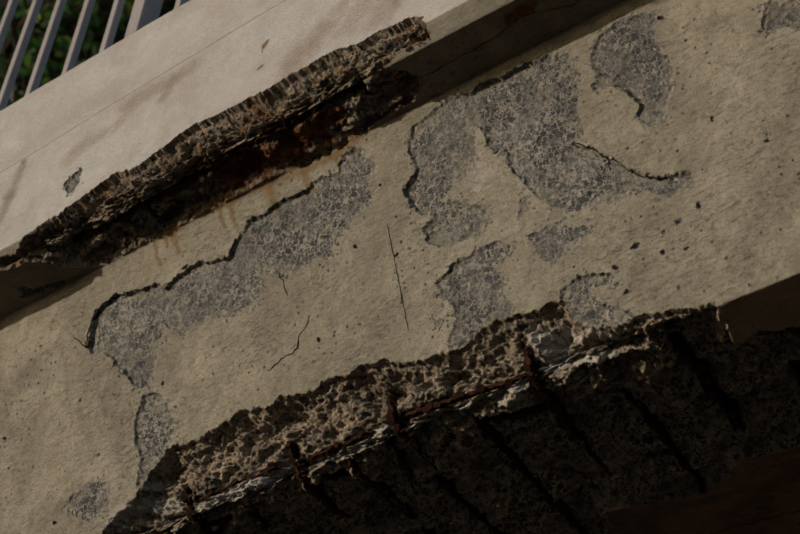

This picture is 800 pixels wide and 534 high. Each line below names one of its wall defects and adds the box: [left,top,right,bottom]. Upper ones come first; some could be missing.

peeling [588,11,680,129]
peeling [756,0,800,39]
spalling [0,16,431,391]
corrosion [73,70,371,243]
peeling [402,47,695,273]
crack [573,142,670,180]
crack [387,225,408,328]
peeling [58,476,111,524]
crack [272,315,309,368]
corrosion [180,428,445,534]
spalling [102,239,800,534]
corrosion [386,337,590,534]